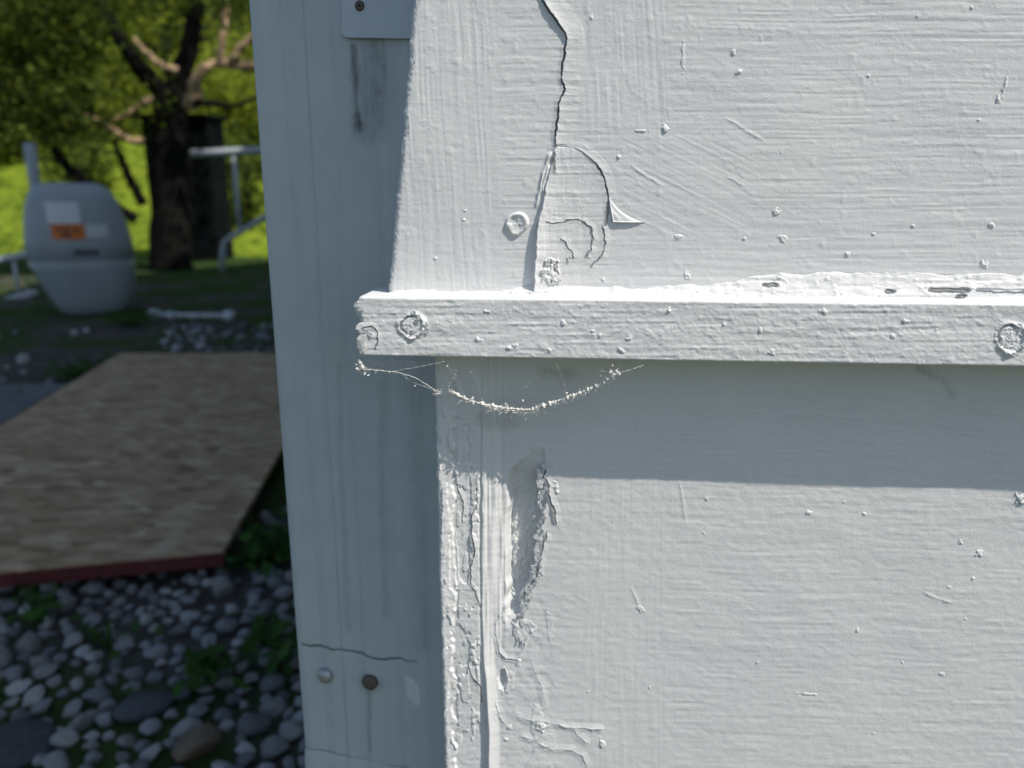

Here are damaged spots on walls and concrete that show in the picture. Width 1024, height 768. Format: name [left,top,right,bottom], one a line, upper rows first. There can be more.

crack [538,0,617,272]
peeling [506,455,562,645]
crack [301,642,418,663]
spalling [496,666,509,695]